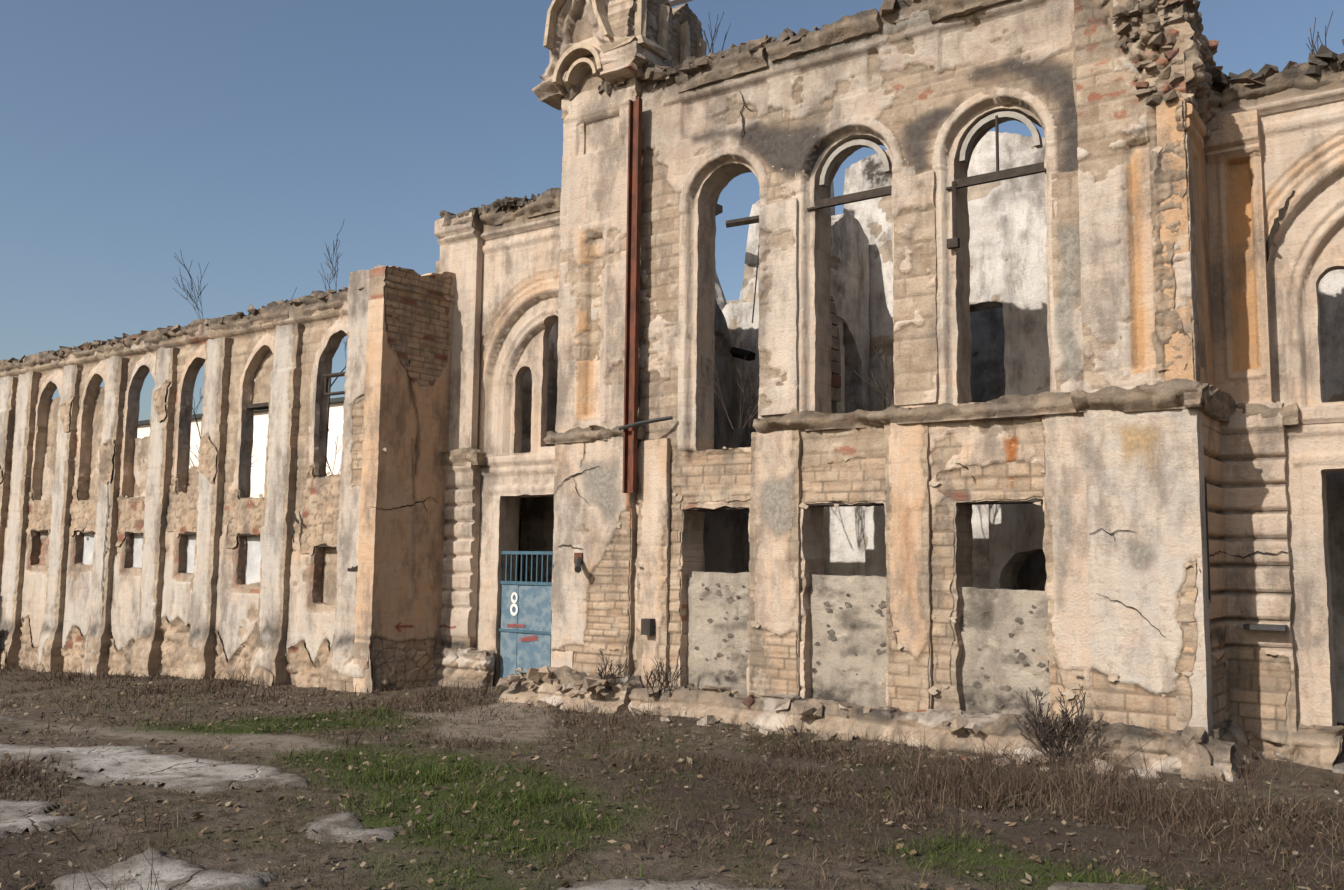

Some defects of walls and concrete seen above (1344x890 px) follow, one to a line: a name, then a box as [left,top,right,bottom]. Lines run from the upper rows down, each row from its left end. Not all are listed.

water stain [766,10,929,64]
water stain [904,108,953,170]
water stain [975,59,1078,172]
spalling [1112,0,1344,371]
crack [1266,190,1295,262]
spalling [384,267,453,386]
rust [1005,438,1017,480]
crack [374,497,437,513]
spalling [496,509,673,723]
spalling [870,460,1045,713]
crack [1096,593,1165,637]
crack [1199,551,1292,566]